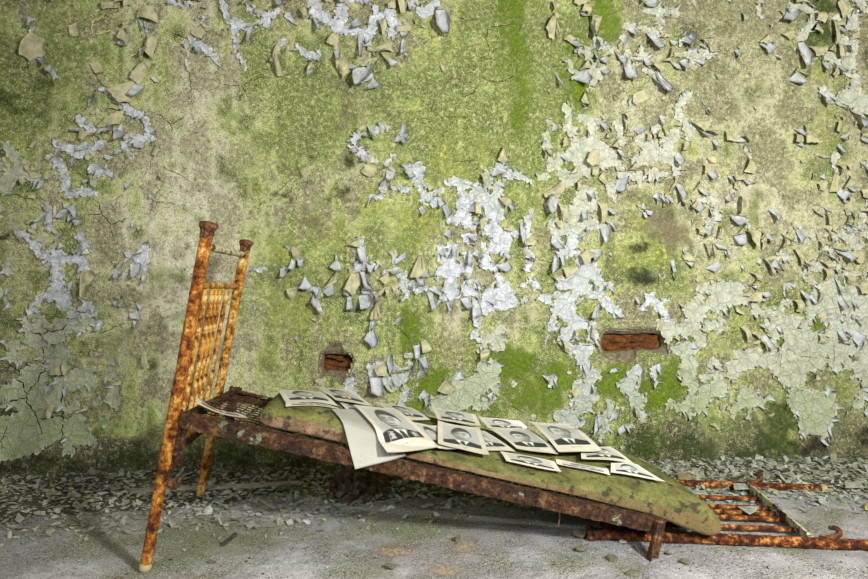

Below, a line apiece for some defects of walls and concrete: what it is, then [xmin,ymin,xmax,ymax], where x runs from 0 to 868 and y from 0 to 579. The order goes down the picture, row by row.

peeling [219,0,451,98]
peeling [0,0,222,462]
peeling [280,0,868,514]
leakage [629,268,656,285]
leakage [631,209,692,251]
crack [0,325,66,441]
leakage [801,438,826,455]
peeling [0,467,157,557]
peeling [158,465,571,551]